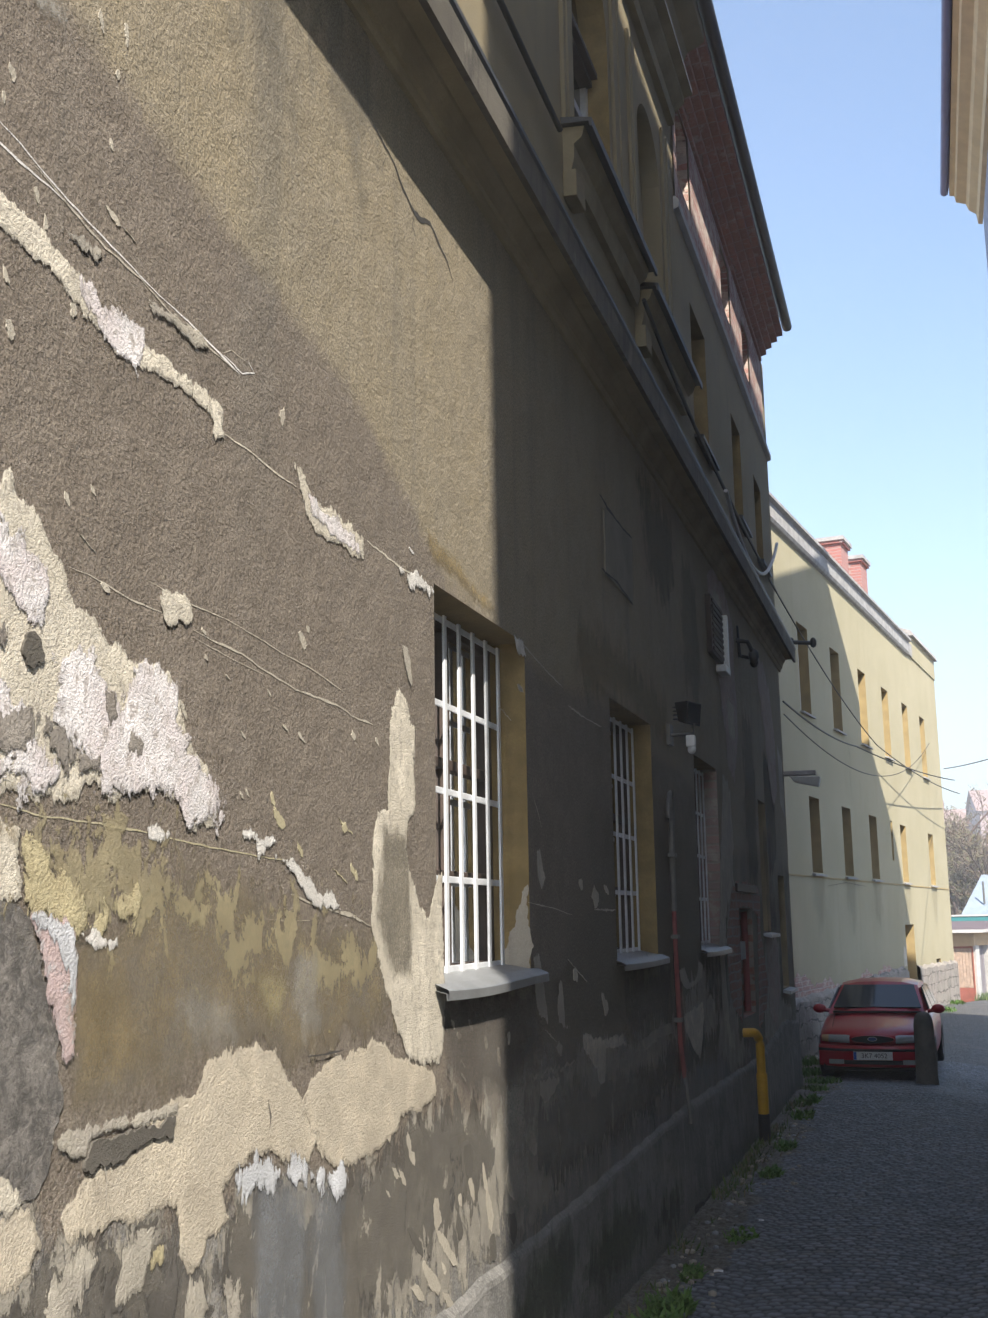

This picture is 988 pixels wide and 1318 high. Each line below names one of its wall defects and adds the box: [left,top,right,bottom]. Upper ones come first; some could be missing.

peeling [2,62,16,104]
crack [366,74,453,282]
peeling [34,186,102,262]
peeling [105,205,136,242]
peeling [4,319,16,341]
spalling [70,273,145,378]
peeling [149,299,210,349]
peeling [213,420,225,439]
spalling [757,659,785,818]
peeling [642,961,715,1066]